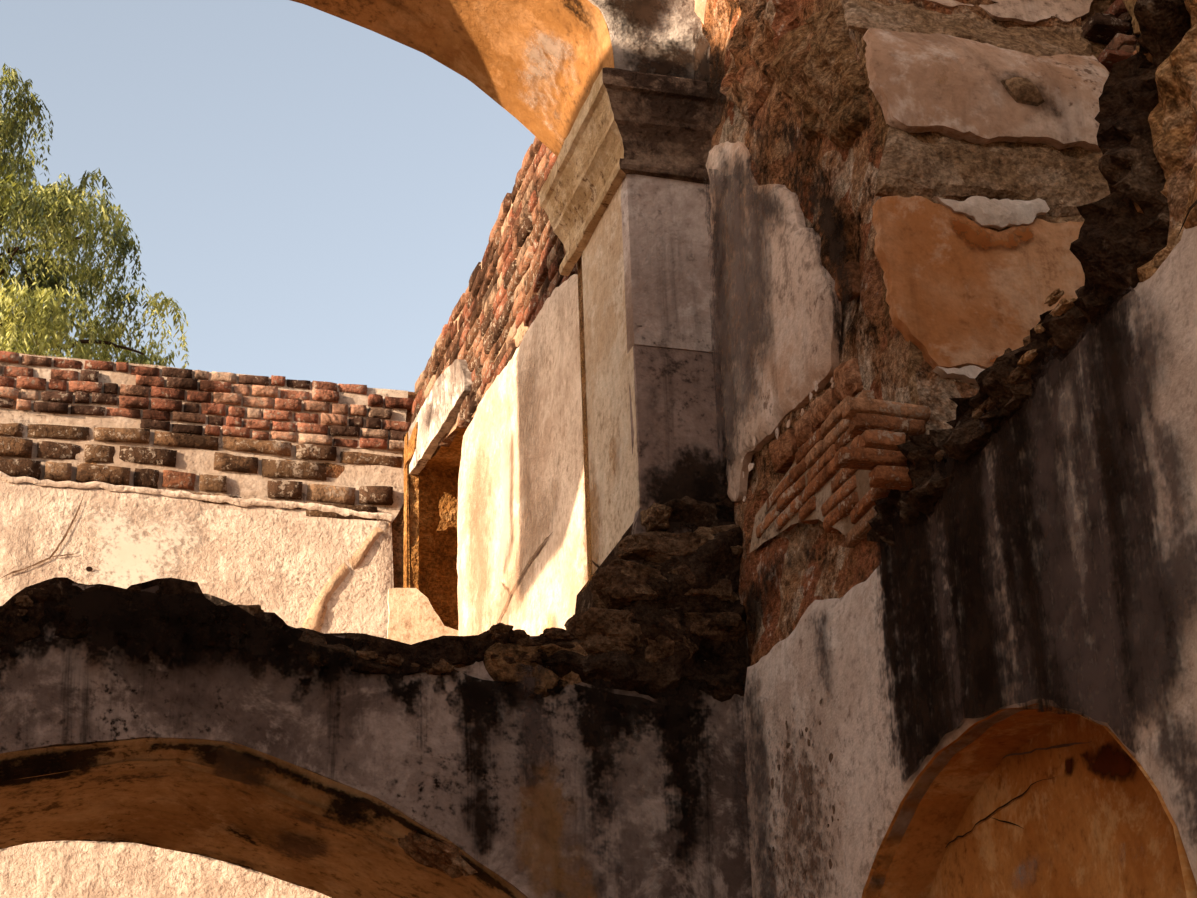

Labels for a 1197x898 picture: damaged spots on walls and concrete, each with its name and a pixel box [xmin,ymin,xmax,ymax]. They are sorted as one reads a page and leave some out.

water stain [605,0,736,122]
spalling [720,0,1092,149]
spalling [875,126,1110,230]
water stain [640,113,852,522]
peeling [1034,288,1076,333]
flaking render [775,377,835,440]
water stain [500,432,511,573]
water stain [583,483,598,583]
water stain [877,286,1197,839]
water stain [0,508,711,898]
spalling [483,642,588,699]
crack [945,741,1092,848]